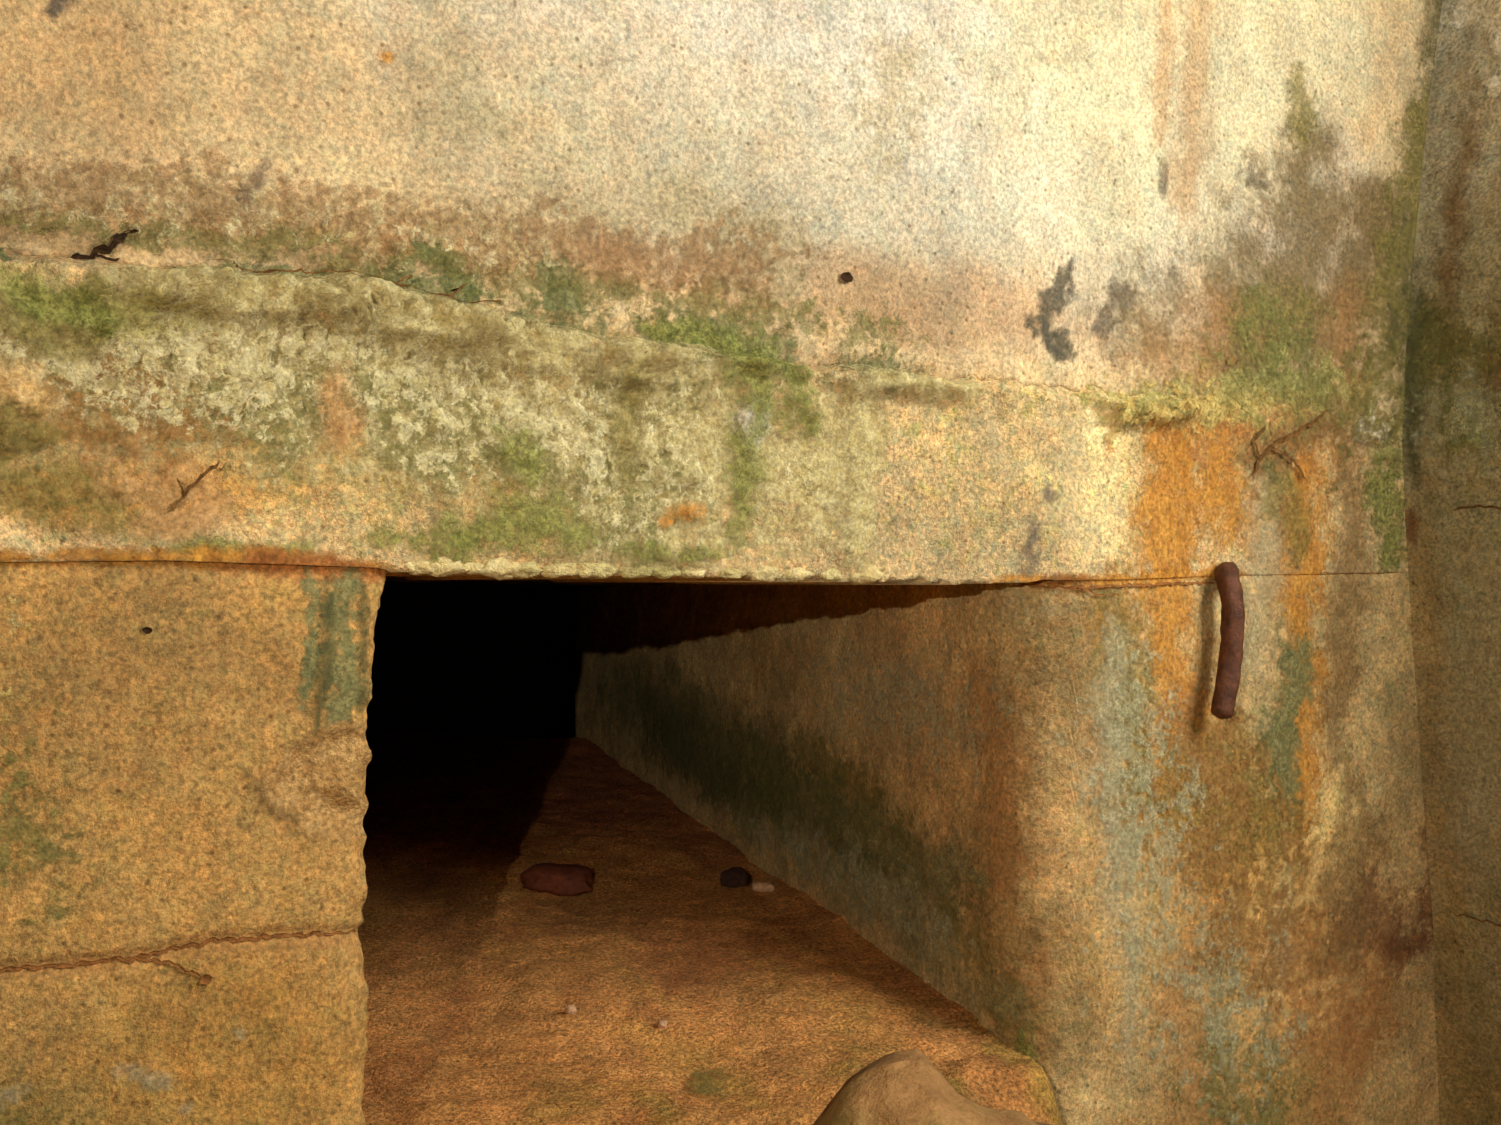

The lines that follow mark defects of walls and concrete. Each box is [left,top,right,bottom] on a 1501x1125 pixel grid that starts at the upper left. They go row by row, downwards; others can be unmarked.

damp [1422,0,1501,98]
crack [70,229,139,261]
crack [208,259,511,308]
damp [1027,258,1075,360]
damp [1094,283,1168,352]
damp [1190,66,1430,407]
damp [0,276,890,574]
crack [1008,580,1216,596]
rust [995,360,1365,900]
crack [0,929,356,977]